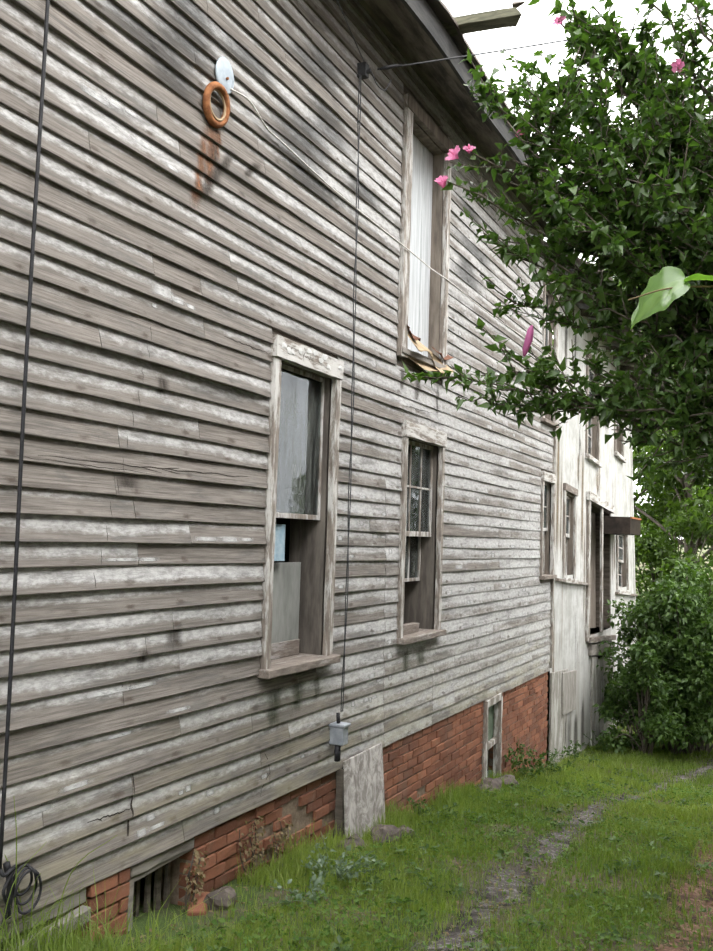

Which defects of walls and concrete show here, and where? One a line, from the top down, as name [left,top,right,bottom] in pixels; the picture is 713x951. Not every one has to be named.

rust [193,81,230,196]
crack [87,774,135,836]